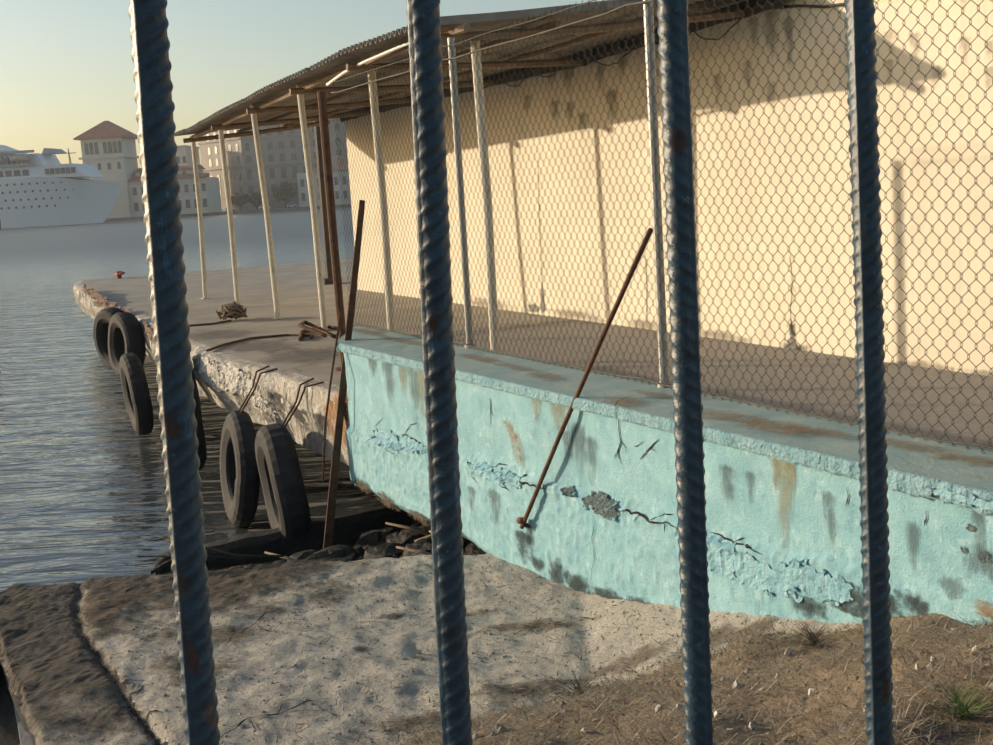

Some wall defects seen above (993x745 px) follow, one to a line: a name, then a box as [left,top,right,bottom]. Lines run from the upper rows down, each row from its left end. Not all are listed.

spalling [192,353,284,421]
flaking render [369,429,427,454]
crack [614,396,659,462]
leakage [516,527,648,604]
spalling [560,485,620,521]
crack [620,509,677,533]
crack [710,532,763,555]
flaking render [706,532,853,606]